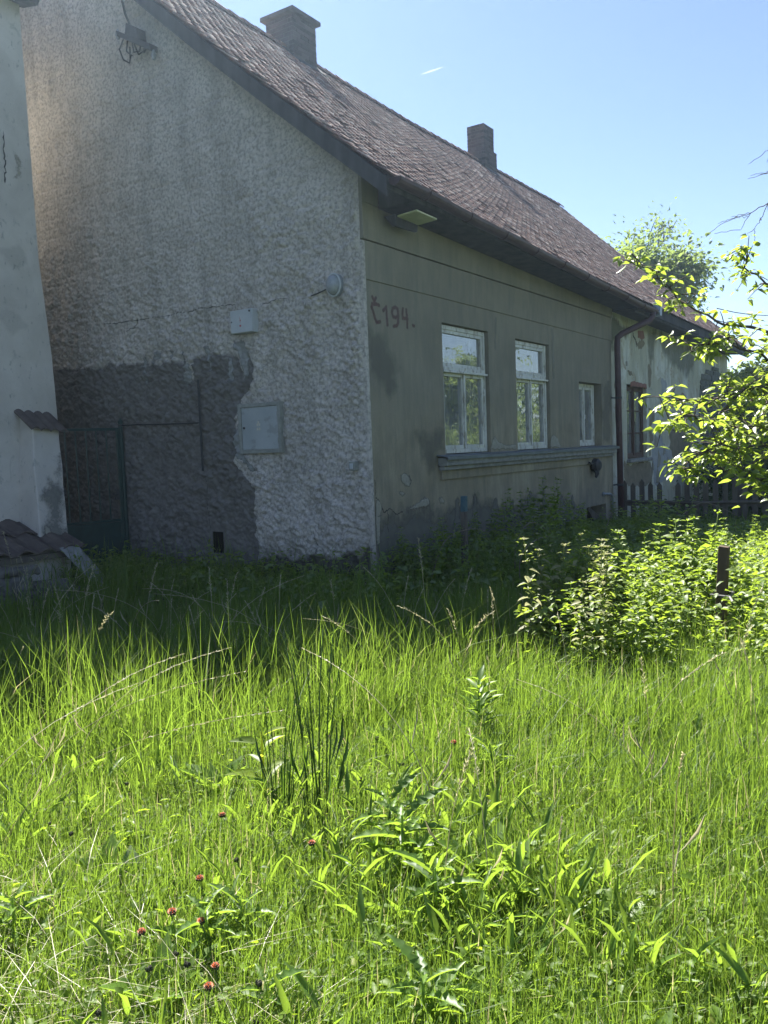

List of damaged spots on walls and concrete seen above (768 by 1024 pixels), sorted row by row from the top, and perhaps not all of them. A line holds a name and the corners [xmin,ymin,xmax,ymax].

crack [104,304,235,332]